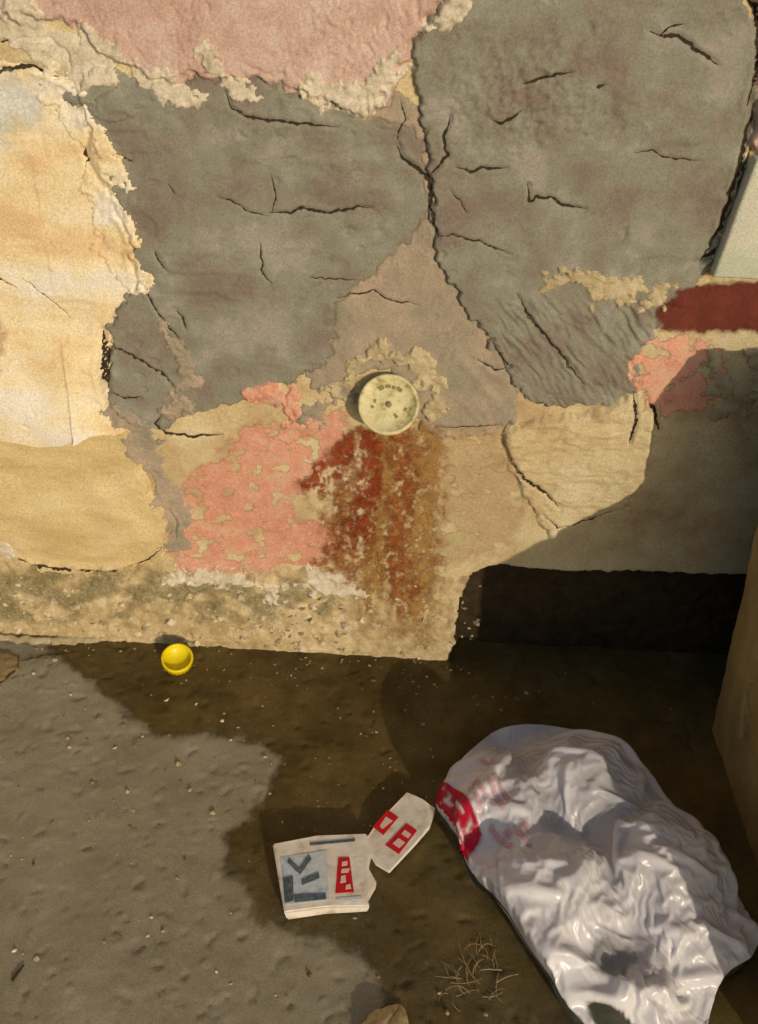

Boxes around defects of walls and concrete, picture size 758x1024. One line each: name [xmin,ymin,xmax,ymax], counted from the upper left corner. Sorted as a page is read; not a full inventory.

peeling [420,0,472,33]
crack [649,24,718,65]
crack [224,90,338,127]
peeling [297,48,413,120]
crack [218,176,370,215]
crack [397,104,509,254]
spalling [0,0,373,607]
crack [100,330,173,399]
crack [154,415,222,439]
crack [629,391,659,443]
rust [299,423,446,633]
leakage [47,638,758,1024]